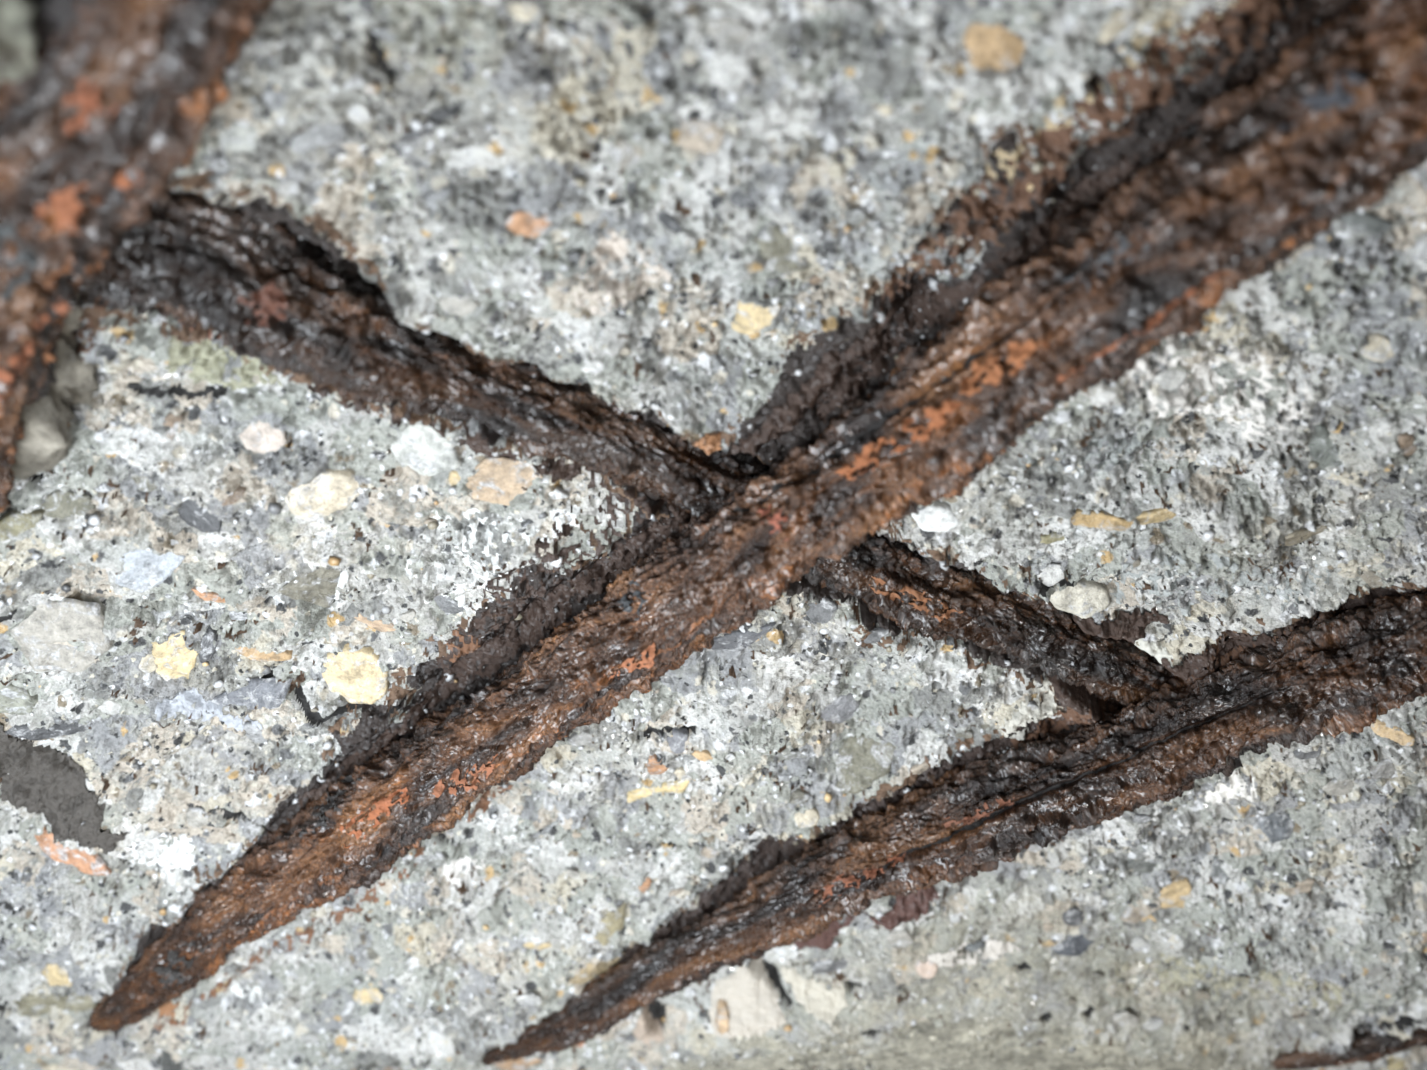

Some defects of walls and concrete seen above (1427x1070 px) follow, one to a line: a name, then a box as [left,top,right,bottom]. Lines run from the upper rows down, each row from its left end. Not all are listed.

spalling [1121,334,1319,444]
corrosion [1123,466,1182,509]
spalling [404,498,582,614]
corrosion [124,605,149,645]
corrosion [225,611,267,659]
corrosion [278,660,319,694]
spalling [1134,639,1173,667]
spalling [997,676,1057,740]
peeling [0,724,196,877]
spalling [1204,766,1258,809]
corrosion [449,864,510,926]
corrosion [1270,1013,1427,1070]